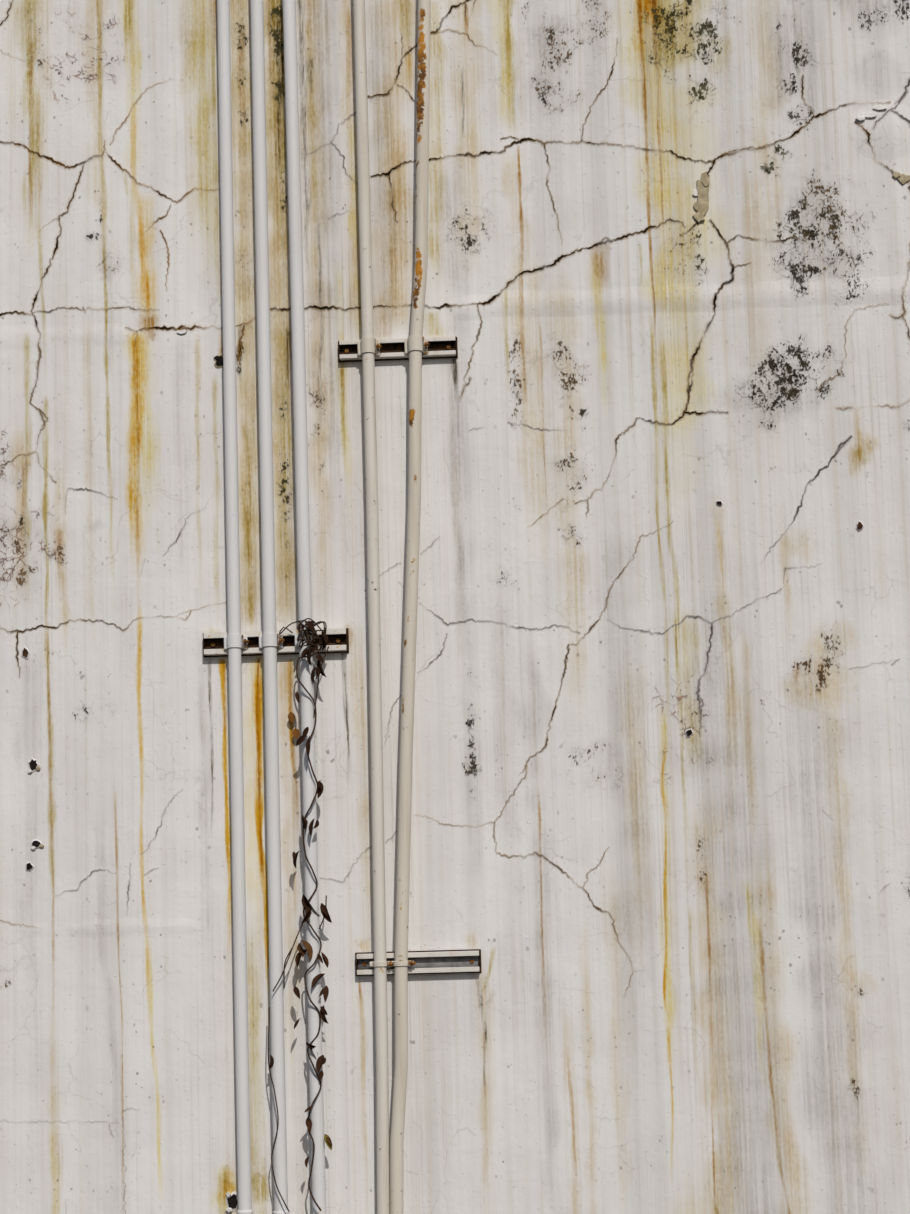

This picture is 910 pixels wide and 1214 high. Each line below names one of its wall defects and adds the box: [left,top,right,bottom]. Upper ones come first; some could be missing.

leakage [533,0,609,112]
leakage [645,0,726,104]
crack [0,86,212,494]
crack [236,0,910,523]
leakage [774,168,873,305]
leakage [725,334,844,428]
leakage [0,512,65,595]
crack [738,409,851,611]
crack [7,611,191,678]
crack [428,609,483,666]
leakage [793,633,843,692]
crack [493,535,713,932]